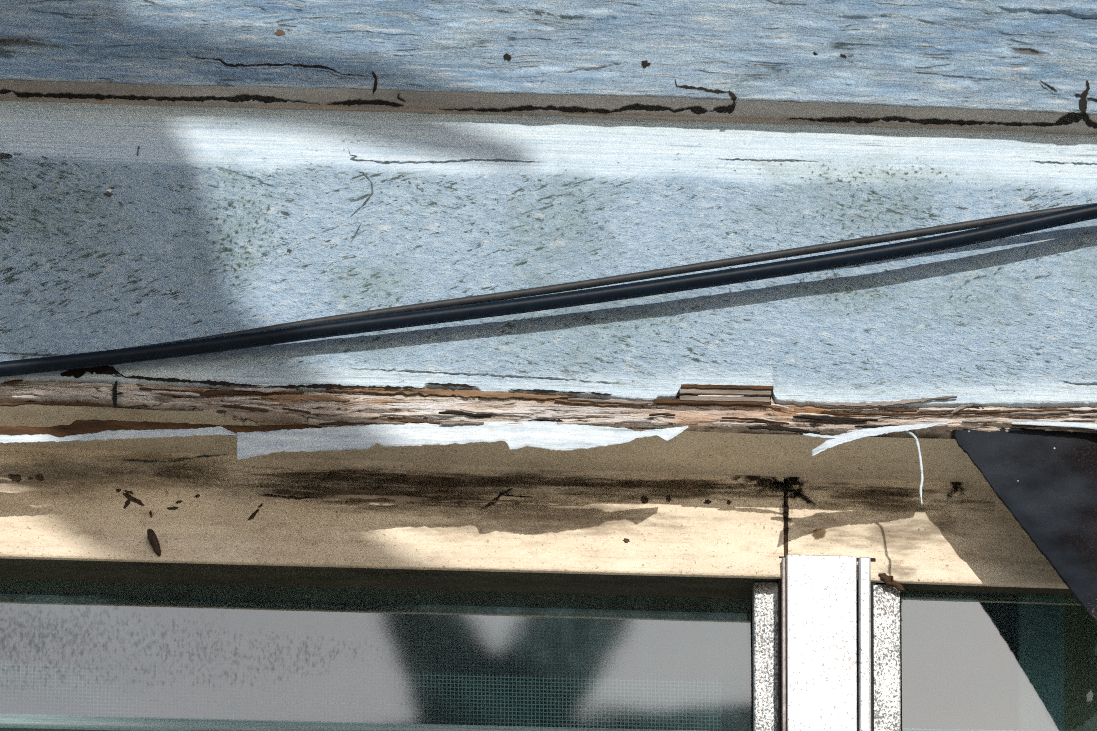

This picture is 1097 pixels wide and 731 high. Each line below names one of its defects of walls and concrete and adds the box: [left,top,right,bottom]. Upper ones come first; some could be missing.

crack [0,53,405,107]
crack [440,79,737,114]
peeling [0,419,689,461]
peeling [1011,421,1097,430]
damp [253,470,717,507]
damp [733,475,816,533]
crack [782,492,790,557]